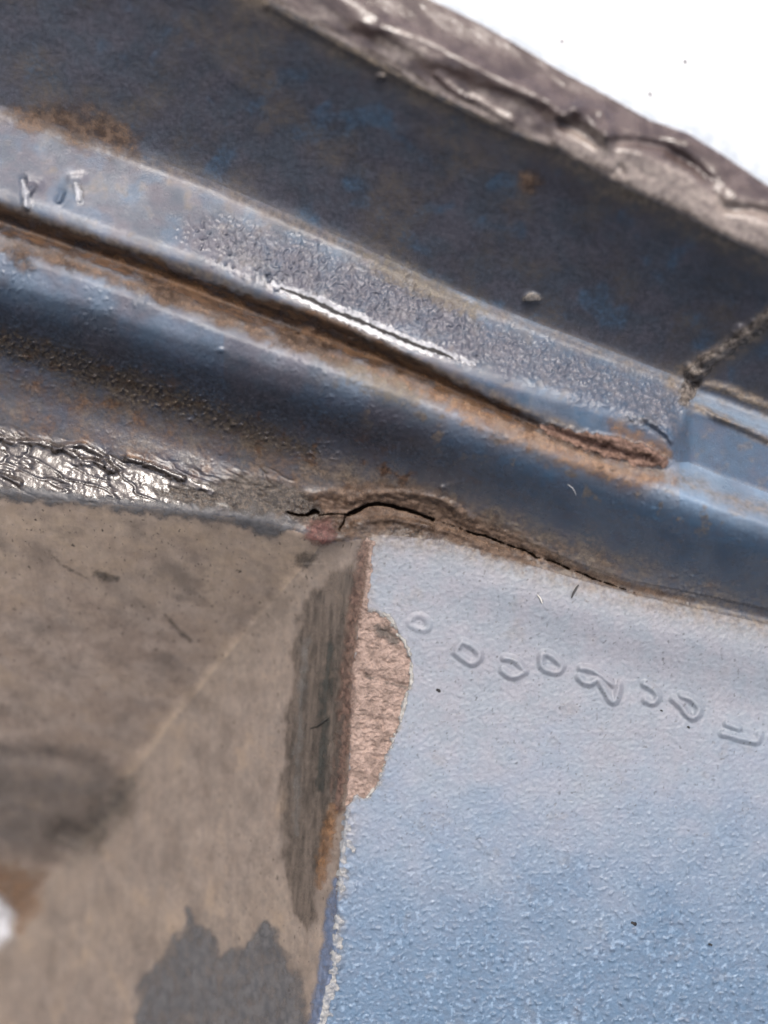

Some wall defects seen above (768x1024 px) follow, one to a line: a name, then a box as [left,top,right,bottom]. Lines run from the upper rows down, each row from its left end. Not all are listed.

corrosion [14,107,138,157]
corrosion [0,205,671,486]
crack [286,502,635,593]
peeling [335,537,414,900]
peeling [318,915,345,1024]